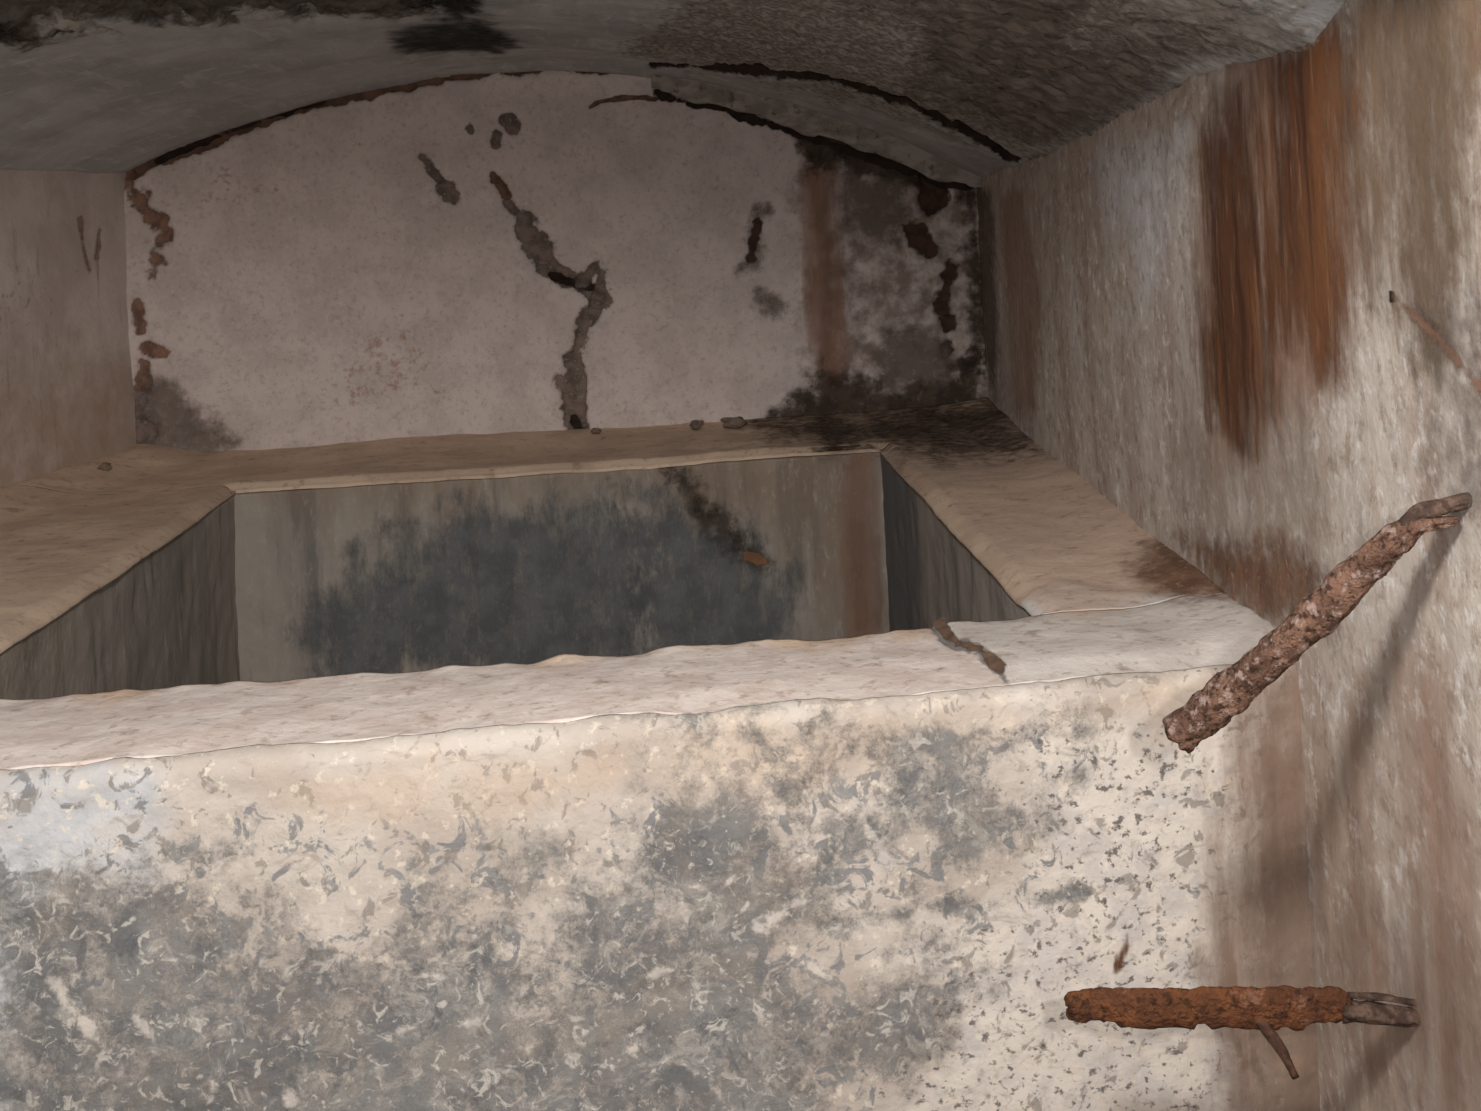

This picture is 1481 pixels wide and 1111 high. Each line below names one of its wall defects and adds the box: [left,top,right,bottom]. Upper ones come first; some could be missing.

spalling [0,0,443,50]
crack [490,171,613,430]
crack [133,62,1021,191]
leakage [795,135,922,245]
leakage [747,187,1044,463]
rust [1202,18,1363,456]
leakage [300,487,800,676]
rust [1064,492,1473,1111]